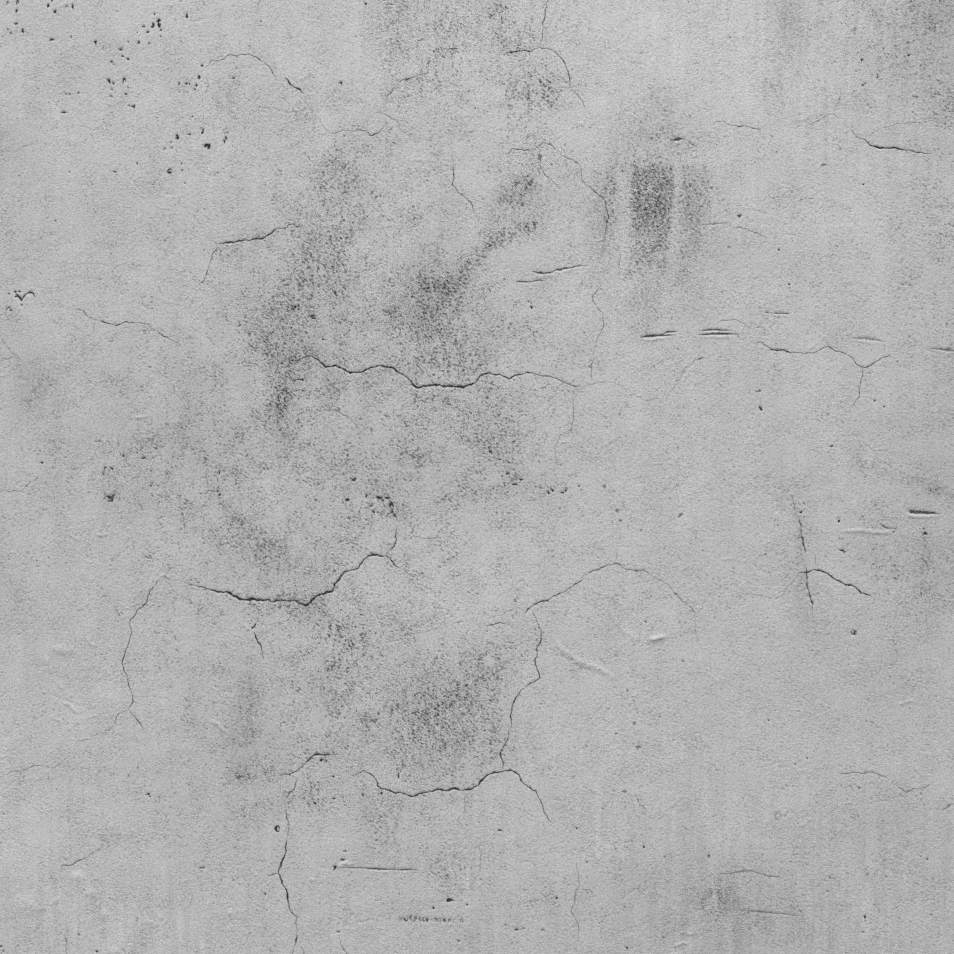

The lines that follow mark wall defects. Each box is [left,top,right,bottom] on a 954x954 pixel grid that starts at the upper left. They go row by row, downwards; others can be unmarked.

water stain [633,164,673,229]
water stain [400,223,535,383]
crack [287,141,704,463]
crack [718,319,890,405]
crack [176,529,439,651]
crack [738,555,872,598]
crack [78,582,157,741]
crack [249,553,706,951]
crack [723,869,778,877]